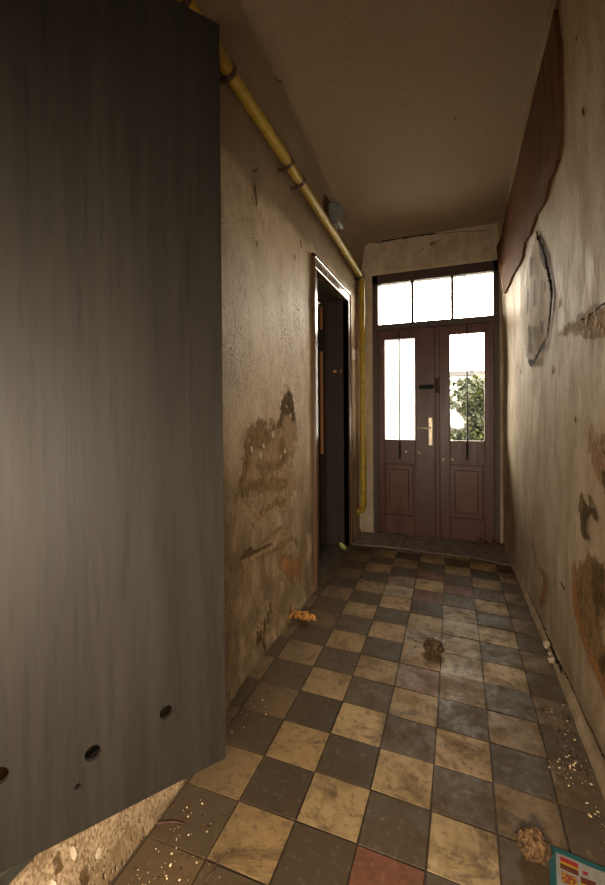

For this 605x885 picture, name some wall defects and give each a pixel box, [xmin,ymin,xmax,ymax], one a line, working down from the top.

spalling [560,304,605,342]
leakage [578,493,598,540]
leakage [572,554,605,698]